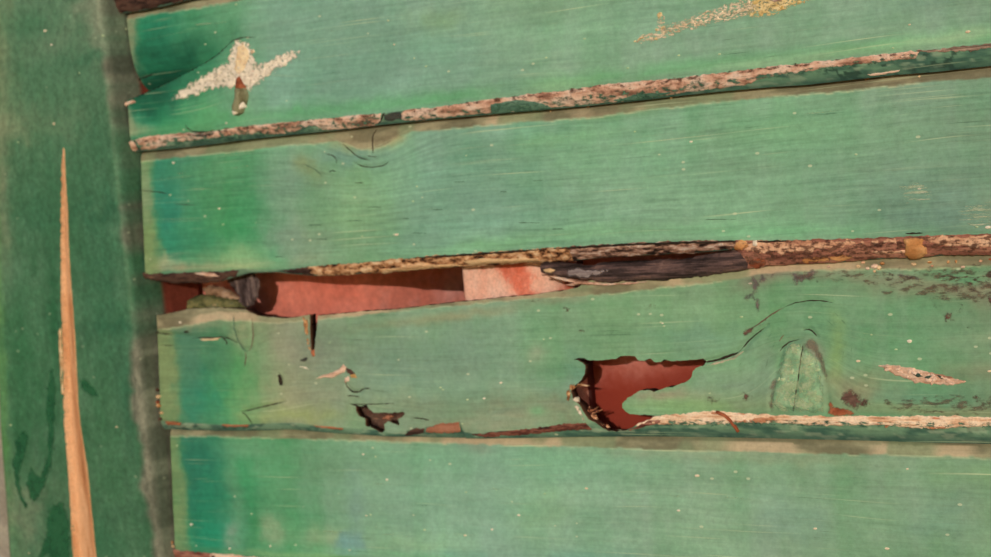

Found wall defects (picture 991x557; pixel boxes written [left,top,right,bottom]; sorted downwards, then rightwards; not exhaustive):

peeling [634,0,809,44]
peeling [129,39,991,151]
water stain [793,270,818,283]
water stain [883,264,991,303]
crack [706,300,833,366]
peeling [878,364,966,385]
spalling [351,404,405,431]
peeling [405,417,461,436]
peeling [629,410,991,431]
water stain [885,396,991,415]